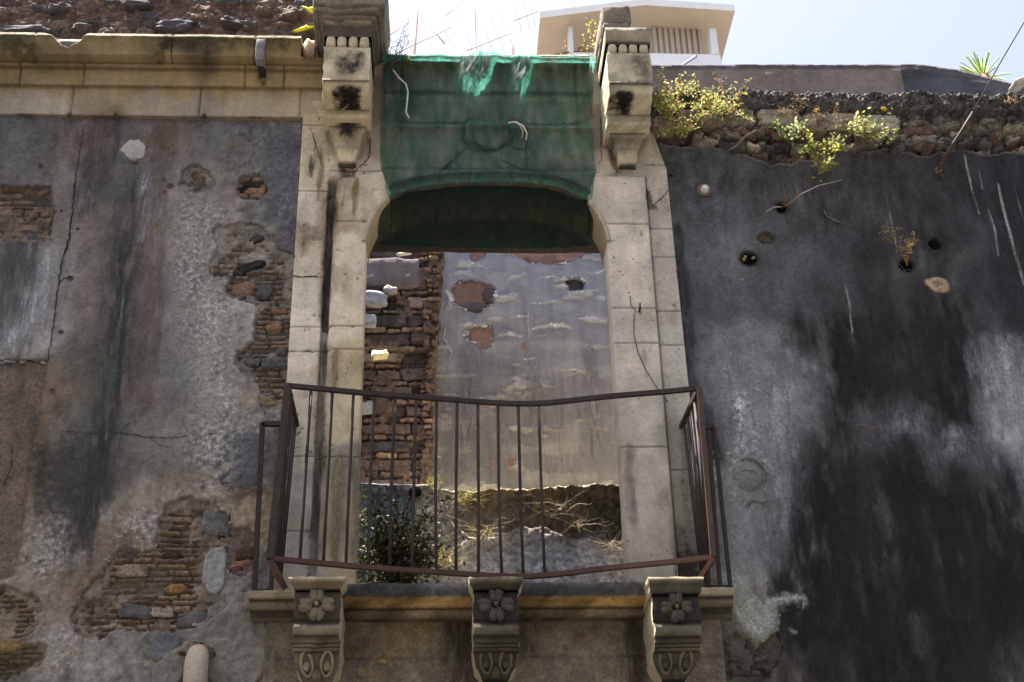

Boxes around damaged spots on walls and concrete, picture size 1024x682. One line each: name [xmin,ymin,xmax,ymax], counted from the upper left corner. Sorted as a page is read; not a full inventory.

damp [332,85,360,110]
peeling [0,360,47,682]
crack [0,125,84,363]
crack [62,419,262,448]
spalling [71,497,259,640]
spalling [209,222,294,421]
damp [250,117,354,329]
damp [311,439,325,541]
spalling [419,252,521,488]
peeling [506,253,591,293]
damp [675,225,698,386]
damp [696,171,1024,682]